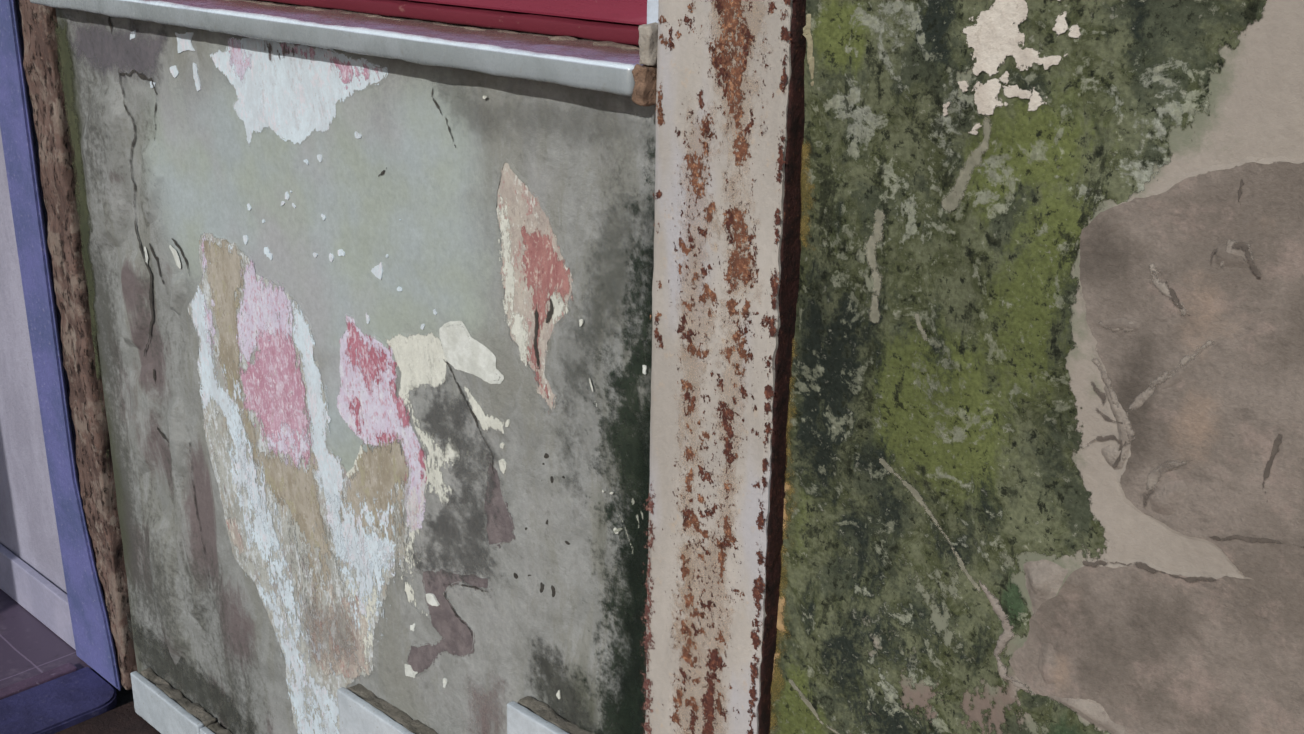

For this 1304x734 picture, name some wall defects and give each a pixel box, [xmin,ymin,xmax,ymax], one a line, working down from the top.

crack [118,70,190,384]
peeling [170,32,390,165]
peeling [494,156,584,414]
leakage [866,209,885,323]
leakage [942,118,991,212]
flaking render [958,0,1068,135]
corrosion [640,0,811,734]
peeling [187,231,527,734]
leakage [879,458,981,591]
flaking render [1009,156,1304,734]
mould [530,643,600,734]
leakage [789,679,840,734]